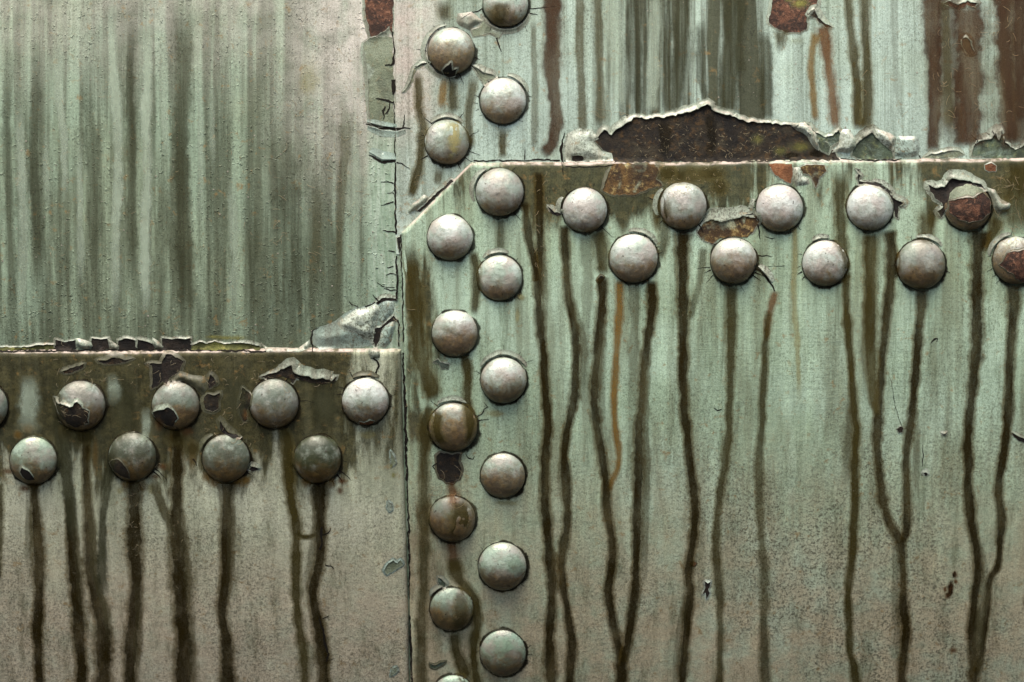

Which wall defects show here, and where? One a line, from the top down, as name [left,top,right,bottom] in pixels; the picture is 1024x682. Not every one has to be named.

rust [542,0,564,155]
peeling [594,98,910,220]
rust [922,0,1024,148]
peeling [0,337,77,351]
damp [55,430,194,682]
peeling [59,335,262,390]
peeling [259,357,339,384]
crack [336,8,614,682]
damp [522,173,658,682]
damp [655,203,705,682]
damp [834,179,927,682]
damp [962,166,1024,682]